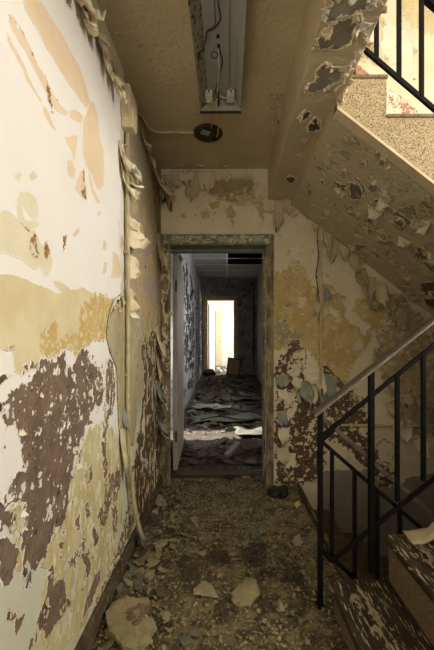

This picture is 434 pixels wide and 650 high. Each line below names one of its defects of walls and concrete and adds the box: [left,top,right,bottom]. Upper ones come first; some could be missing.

peeling [7,0,104,216]
peeling [77,0,128,105]
peeling [296,109,323,145]
peeling [303,0,434,104]
peeling [386,88,419,115]
crack [313,227,321,303]
peeling [274,141,434,486]
peeling [0,127,332,650]
peeling [349,586,400,650]